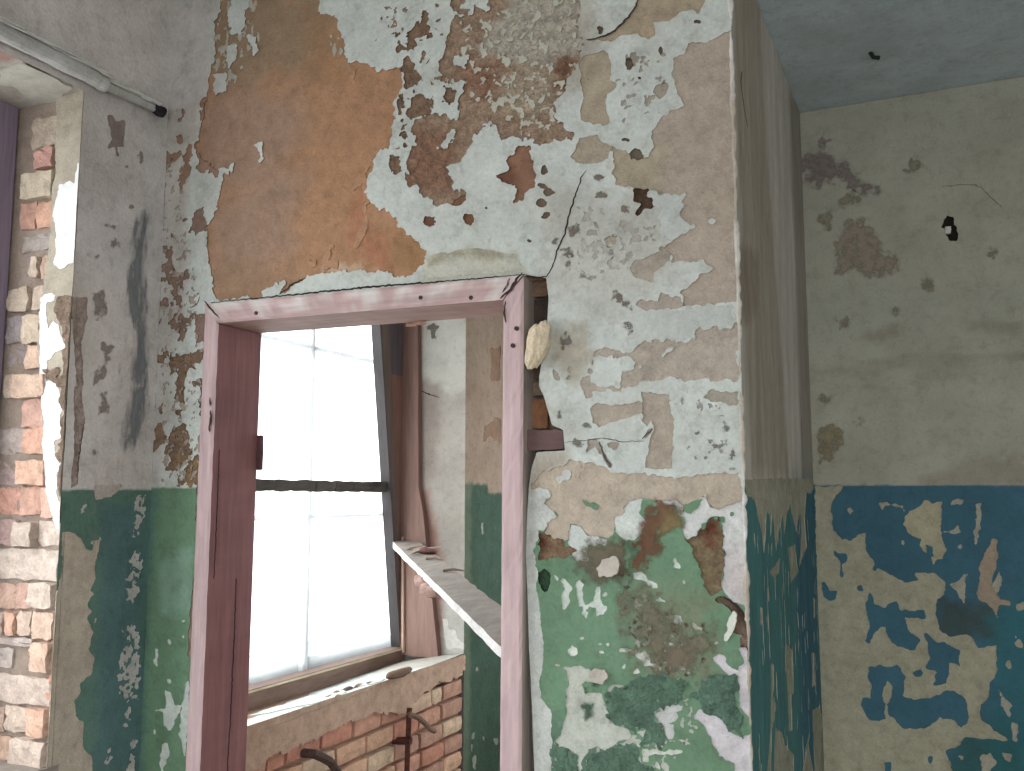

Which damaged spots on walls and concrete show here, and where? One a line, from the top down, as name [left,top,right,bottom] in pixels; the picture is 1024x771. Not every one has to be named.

crack [587,0,638,40]
water stain [93,290,107,320]
water stain [124,205,147,448]
crack [189,171,586,308]
flaking render [153,0,742,520]
water stain [818,213,898,278]
peeling [0,62,113,771]
water stain [94,342,114,413]
crack [565,428,653,467]
rust [574,500,725,596]
peeling [526,389,1024,771]
peeling [153,679,190,771]